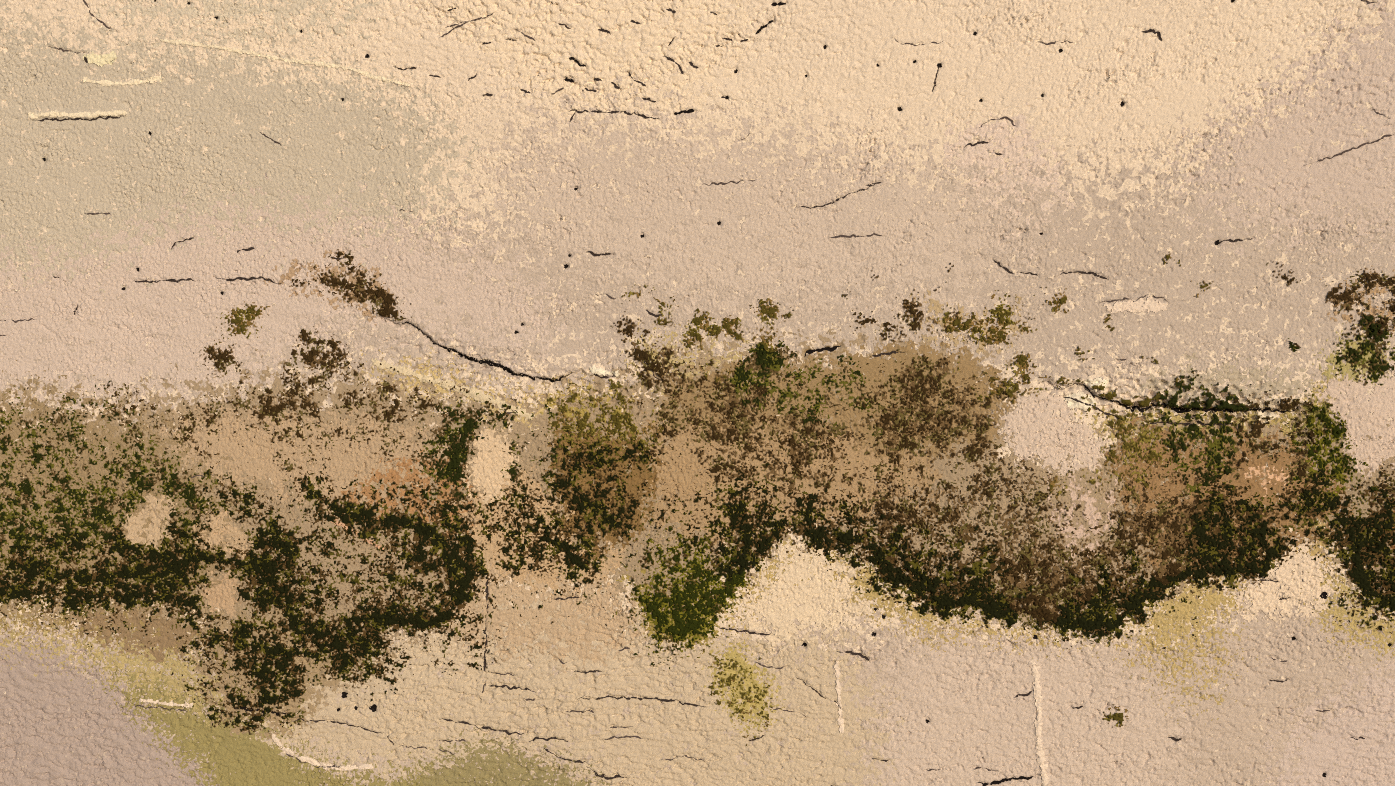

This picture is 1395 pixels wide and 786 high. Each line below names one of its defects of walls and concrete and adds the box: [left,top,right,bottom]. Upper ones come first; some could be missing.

crack [381,318,662,382]
crack [1052,384,1298,426]
water stain [0,574,1395,786]